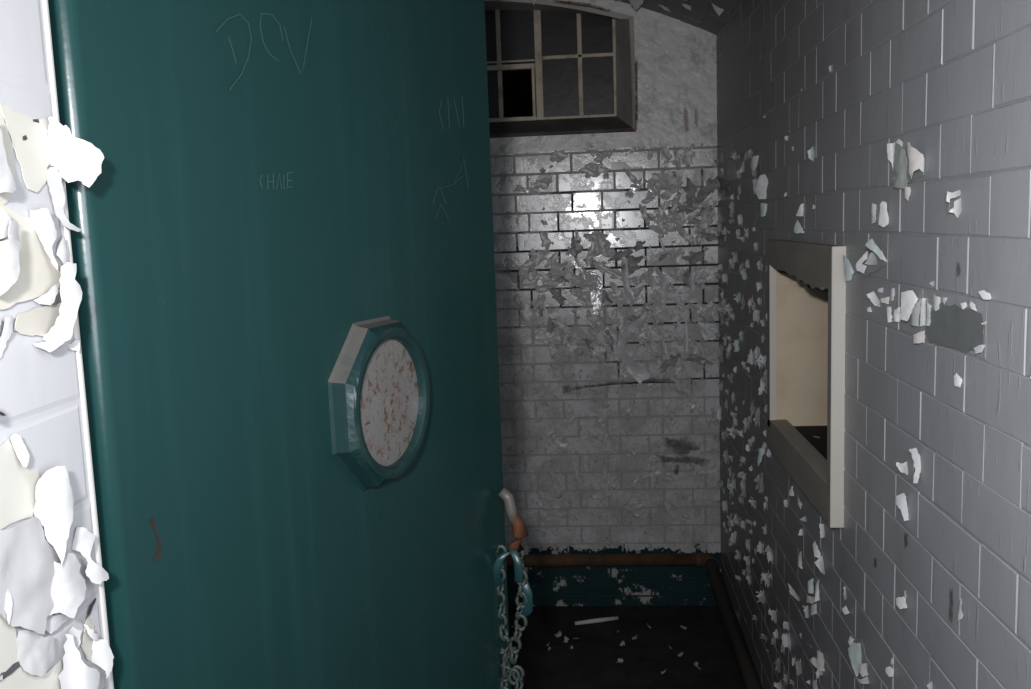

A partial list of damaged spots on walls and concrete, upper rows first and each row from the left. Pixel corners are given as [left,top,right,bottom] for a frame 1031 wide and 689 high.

peeling [887,139,925,201]
peeling [0,104,104,358]
peeling [843,239,888,282]
peeling [871,201,889,227]
peeling [944,190,961,218]
peeling [867,281,991,354]
peeling [515,142,828,689]
peeling [895,448,921,521]
peeling [0,433,114,689]
peeling [896,590,907,609]
peeling [848,636,869,685]